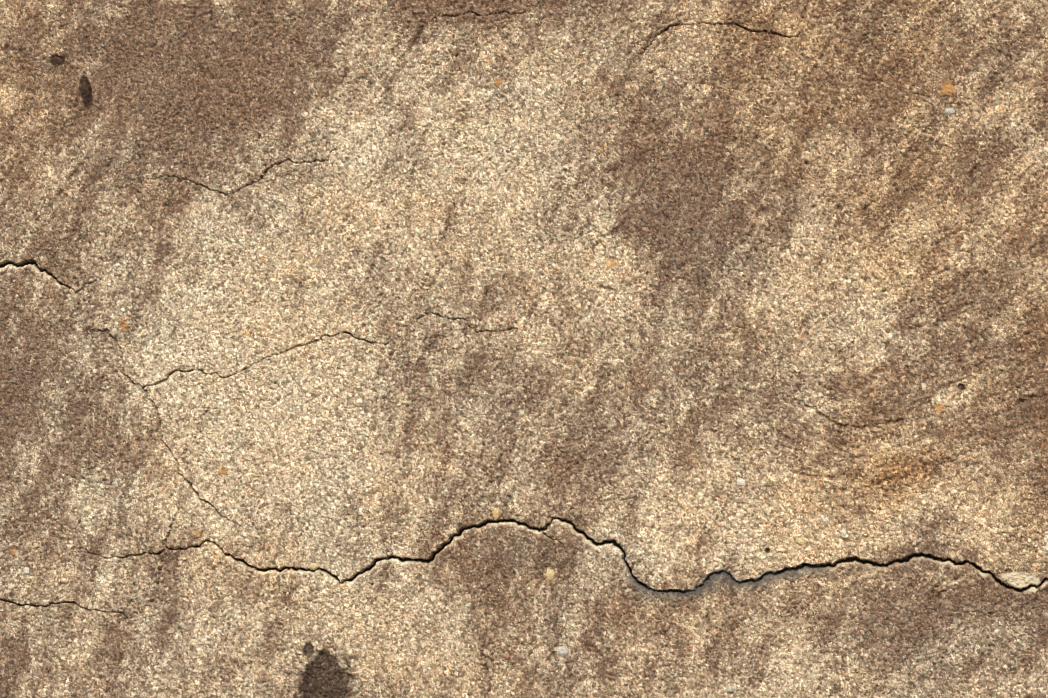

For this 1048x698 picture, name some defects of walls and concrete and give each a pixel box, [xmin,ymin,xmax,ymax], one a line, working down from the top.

crack [0,260,90,293]
crack [99,330,387,440]
crack [82,460,1048,593]
crack [0,599,131,619]